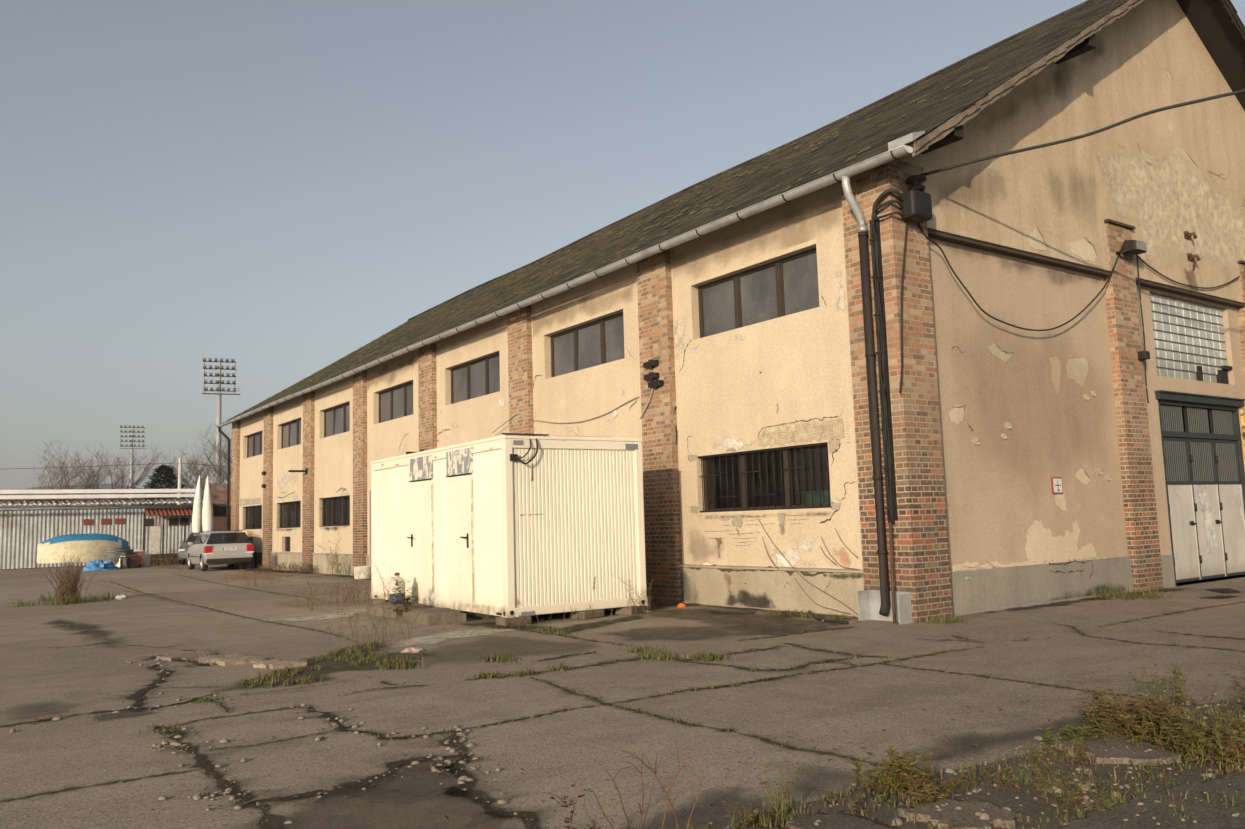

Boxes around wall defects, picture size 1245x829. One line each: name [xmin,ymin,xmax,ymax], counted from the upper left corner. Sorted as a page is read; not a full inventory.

peeling [1049,356,1090,395]
peeling [952,493,1107,572]
crack [1049,560,1093,580]
crack [0,644,541,829]